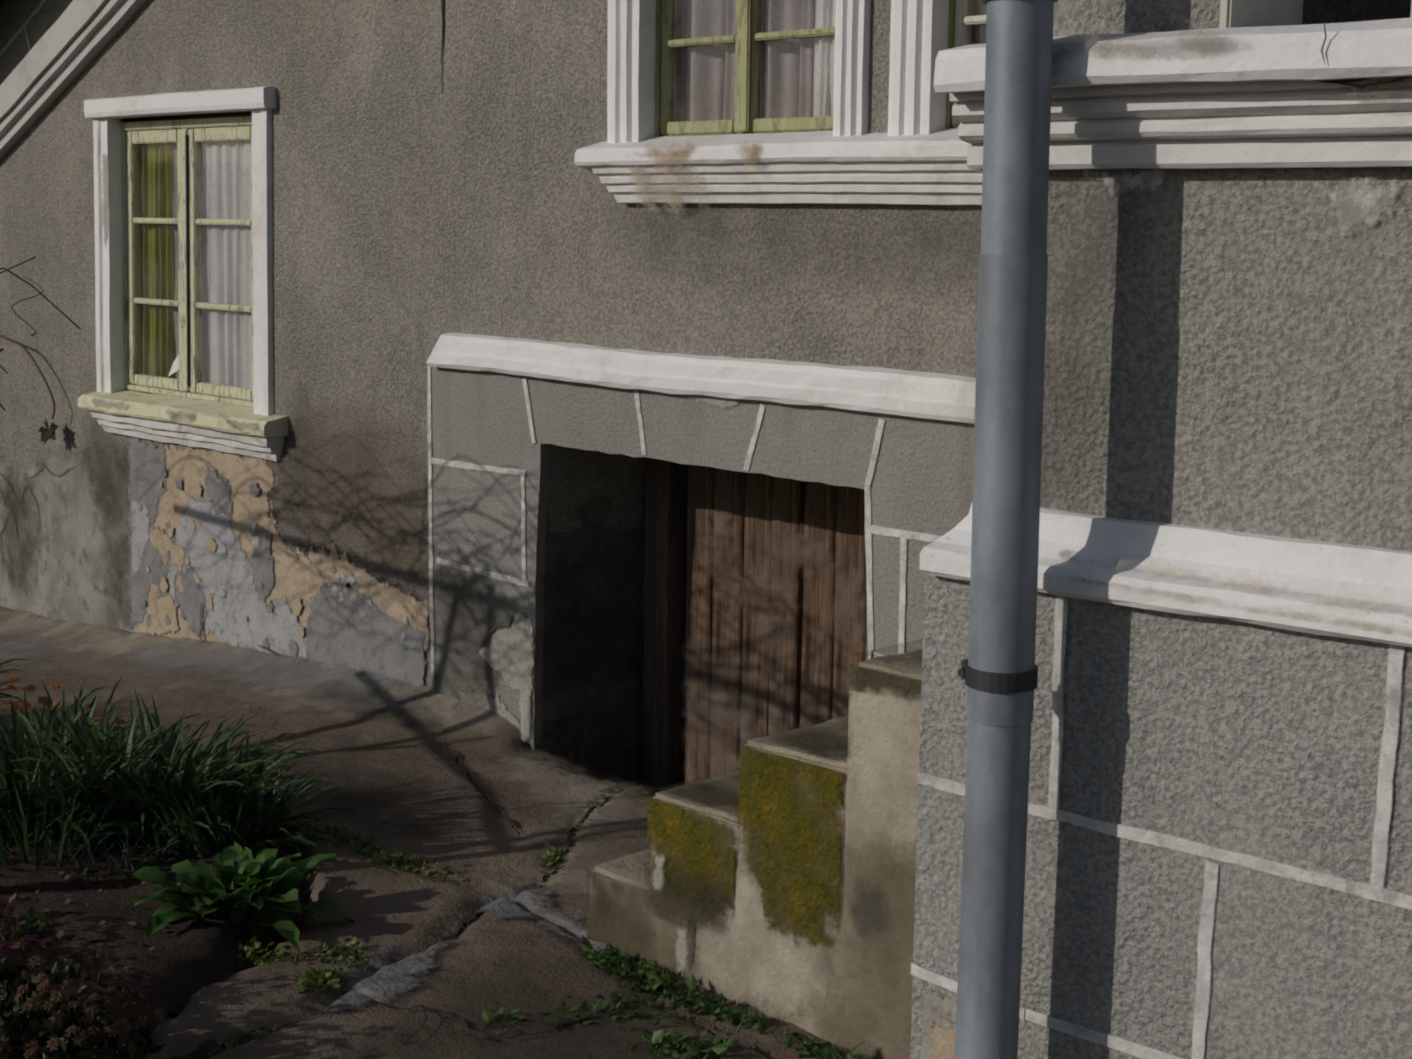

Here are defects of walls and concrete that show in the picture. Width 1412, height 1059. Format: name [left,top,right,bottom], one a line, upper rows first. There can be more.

crack [438,0,446,93]
peeling [127,436,430,662]
leakage [0,443,504,749]
spalling [457,609,534,750]
leakage [488,753,647,833]
crack [372,740,648,1049]
leakage [529,849,620,894]
leakage [626,856,664,921]
crack [170,1020,298,1059]